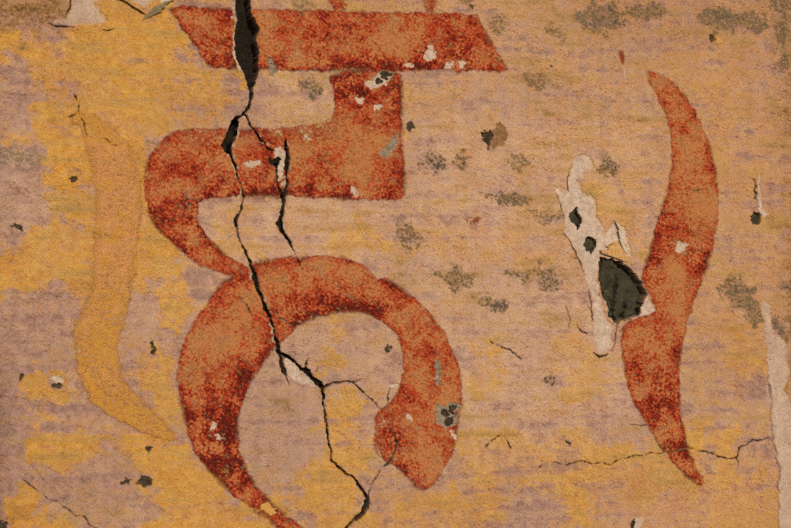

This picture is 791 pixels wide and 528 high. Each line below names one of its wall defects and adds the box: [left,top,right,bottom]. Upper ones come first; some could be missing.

peeling [48,0,114,31]
peeling [118,0,172,21]
crack [221,0,399,528]
peeling [553,154,656,359]
spalling [435,402,462,440]
crack [539,424,769,471]